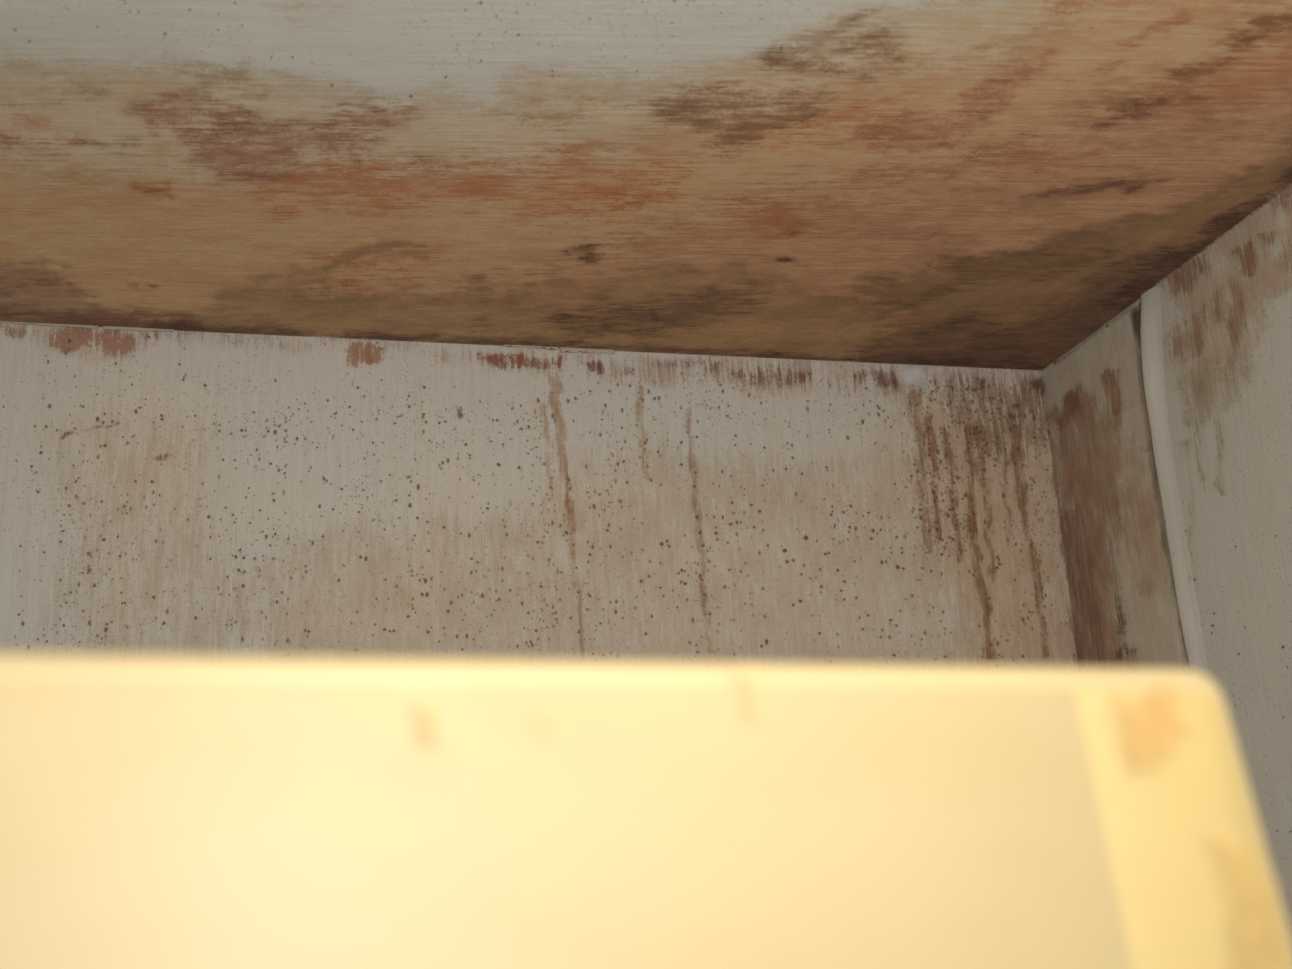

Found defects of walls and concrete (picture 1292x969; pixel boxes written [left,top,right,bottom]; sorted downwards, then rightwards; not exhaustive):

corrosion [44,327,157,358]
damp [0,0,1292,668]
corrosion [477,353,562,370]